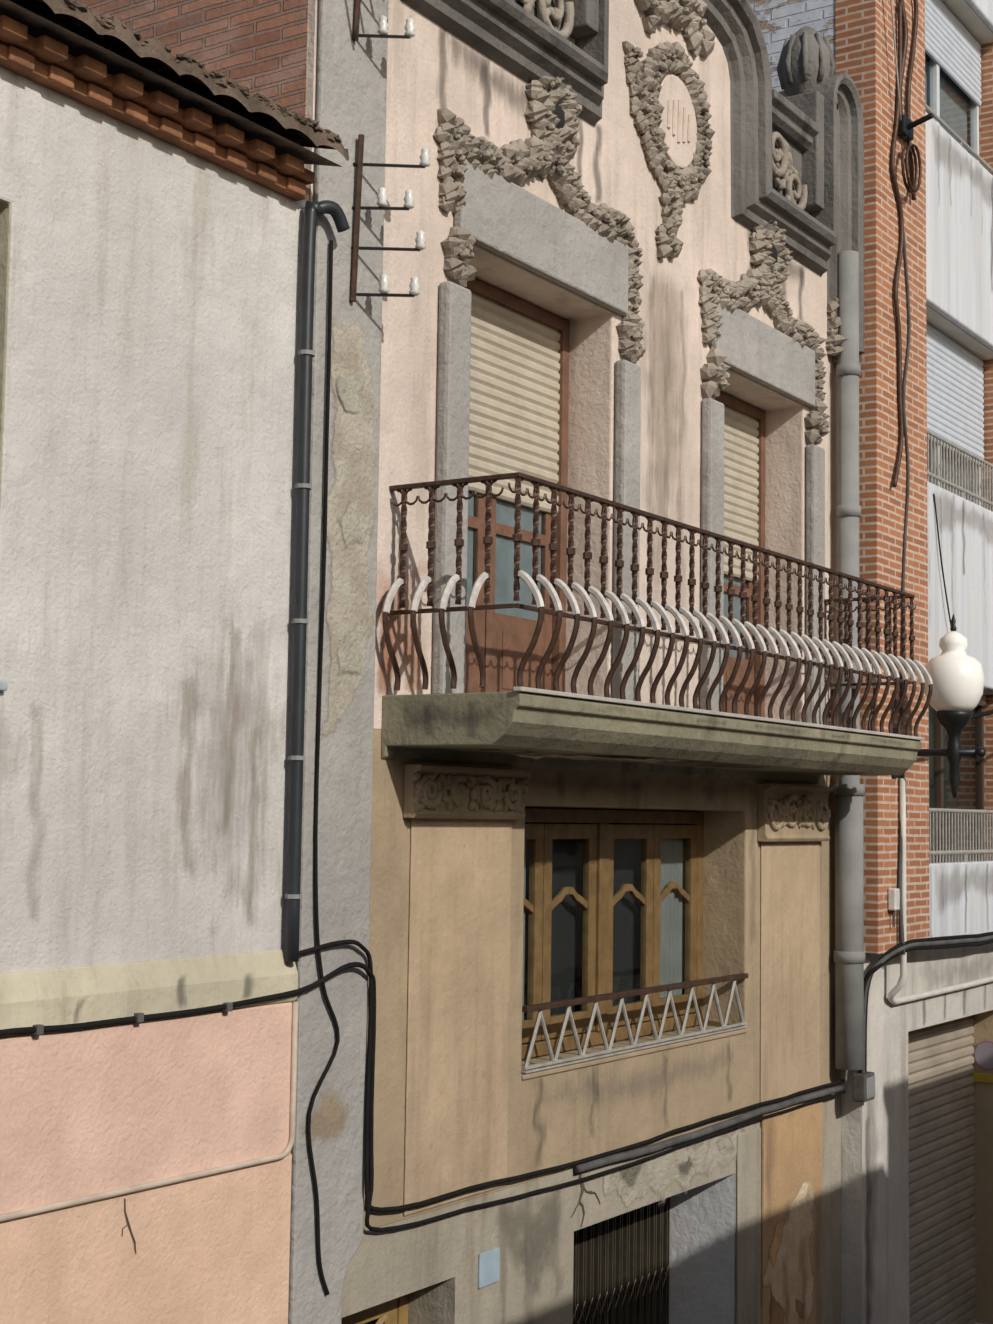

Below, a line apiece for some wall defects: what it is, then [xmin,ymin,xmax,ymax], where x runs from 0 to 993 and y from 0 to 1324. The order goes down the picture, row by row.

crack [122,1198,137,1254]
crack [571,1173,601,1227]
peeling [763,1181,814,1324]